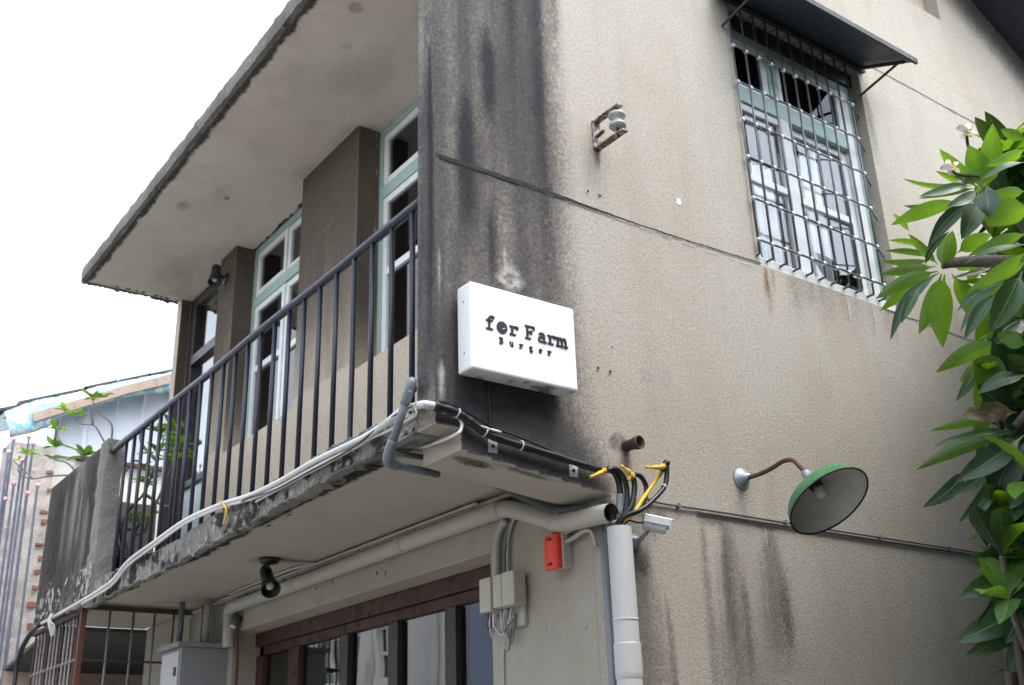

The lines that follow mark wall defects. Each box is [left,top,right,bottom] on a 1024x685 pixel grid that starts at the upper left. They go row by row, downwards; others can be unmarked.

leakage [417,0,608,489]
crack [436,152,761,264]
leakage [33,300,191,623]
spalling [0,434,383,678]
leakage [211,483,288,534]
leakage [303,443,357,479]
leakage [369,429,387,453]